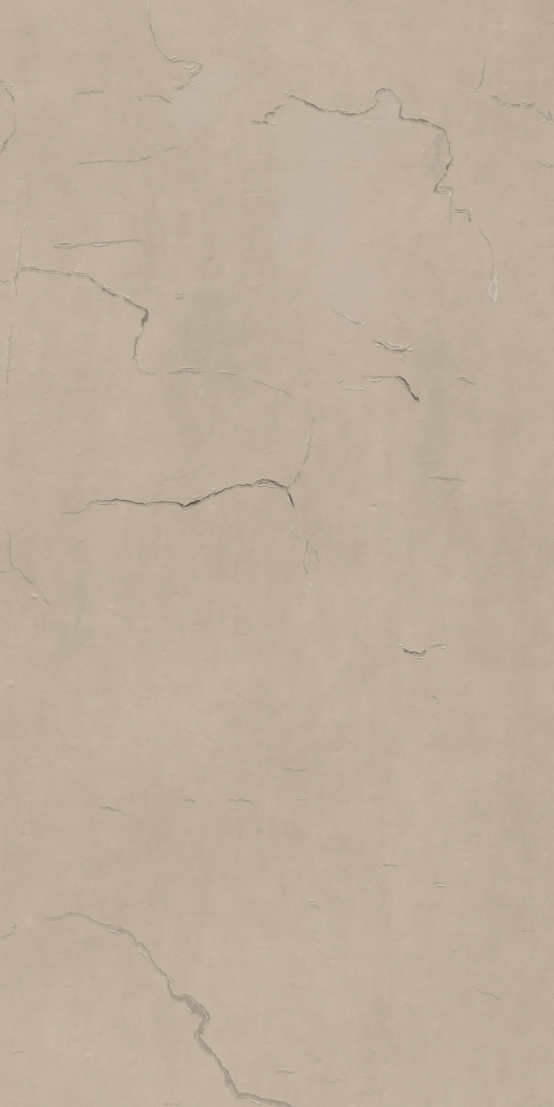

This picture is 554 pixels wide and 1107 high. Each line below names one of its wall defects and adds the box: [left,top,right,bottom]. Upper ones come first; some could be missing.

crack [251,87,498,308]
crack [0,221,291,398]
crack [329,308,420,402]
crack [60,416,320,590]
crack [45,911,294,1107]